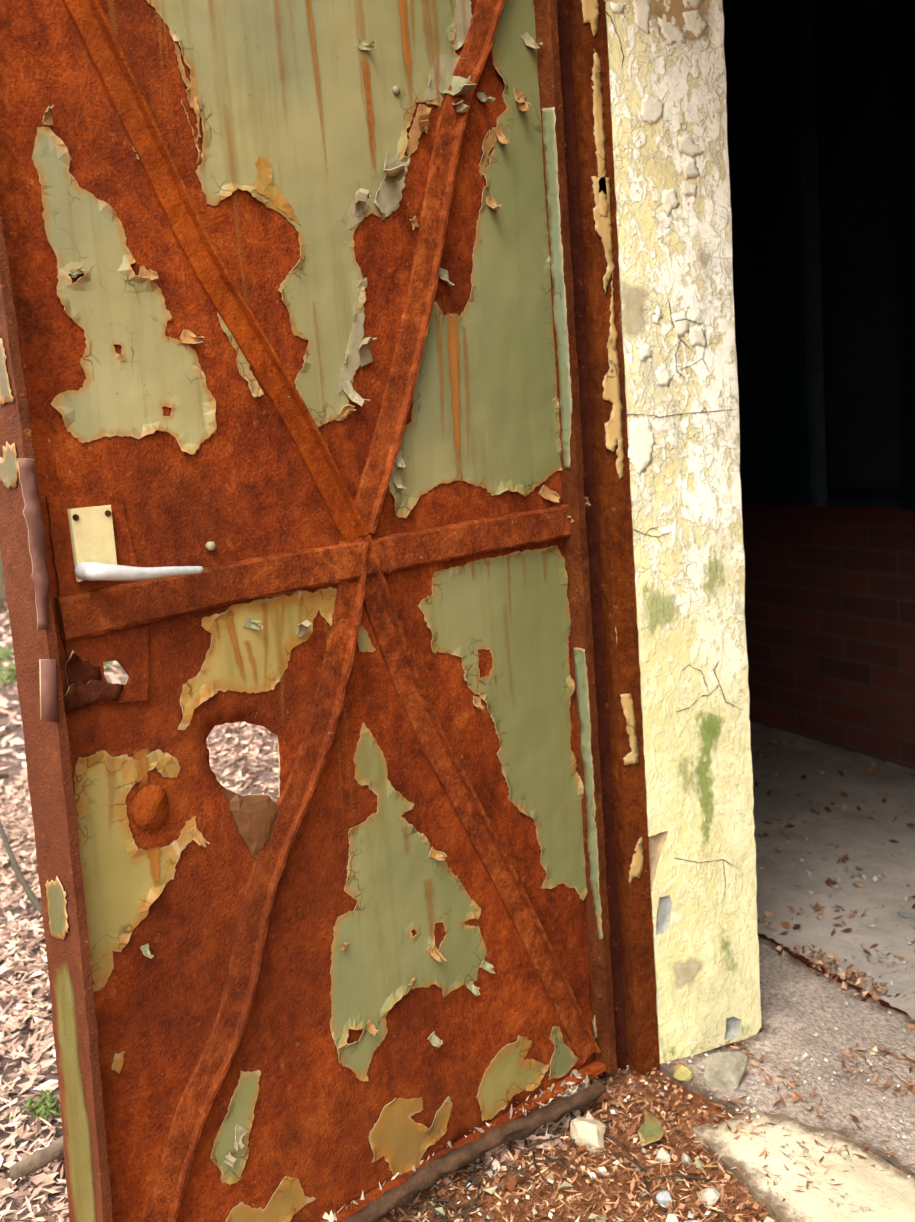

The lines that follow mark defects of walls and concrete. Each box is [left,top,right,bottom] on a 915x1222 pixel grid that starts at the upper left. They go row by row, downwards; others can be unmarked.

peeling [32,105,217,455]
peeling [146,0,572,518]
peeling [581,0,714,480]
peeling [330,723,495,1082]
peeling [418,546,603,941]